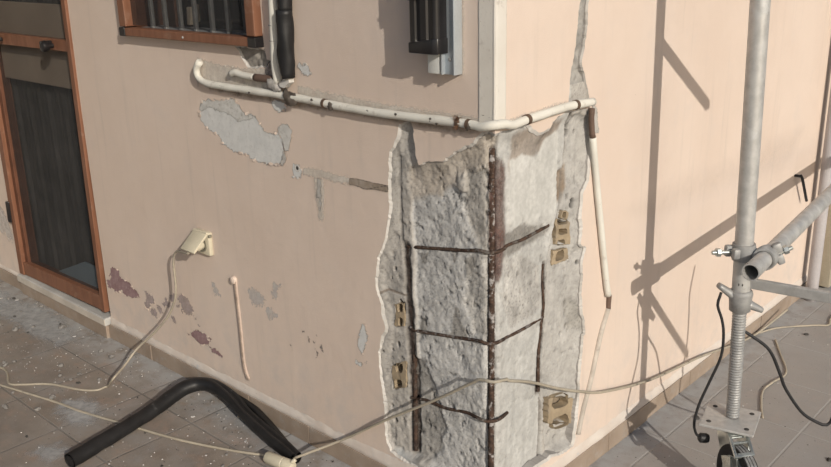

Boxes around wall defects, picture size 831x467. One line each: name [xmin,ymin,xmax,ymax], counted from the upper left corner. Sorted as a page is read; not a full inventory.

crack [569,0,589,102]
peeling [198,97,293,166]
peeling [106,267,223,357]
rust [406,247,420,448]
spalling [375,82,599,467]
rust [489,159,505,281]